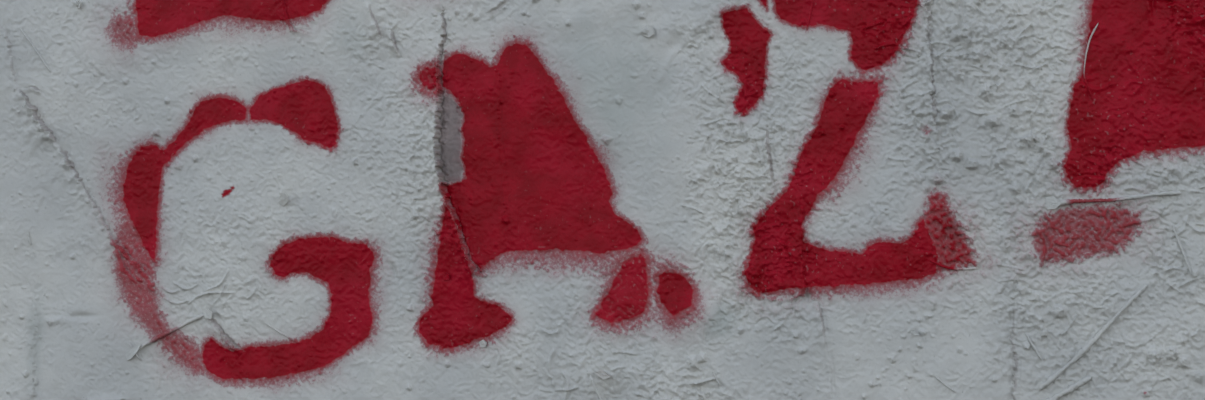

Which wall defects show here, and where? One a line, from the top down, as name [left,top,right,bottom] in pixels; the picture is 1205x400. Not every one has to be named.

crack [278,0,312,35]
crack [365,1,401,57]
crack [480,0,513,21]
crack [0,25,162,295]
crack [428,7,489,278]